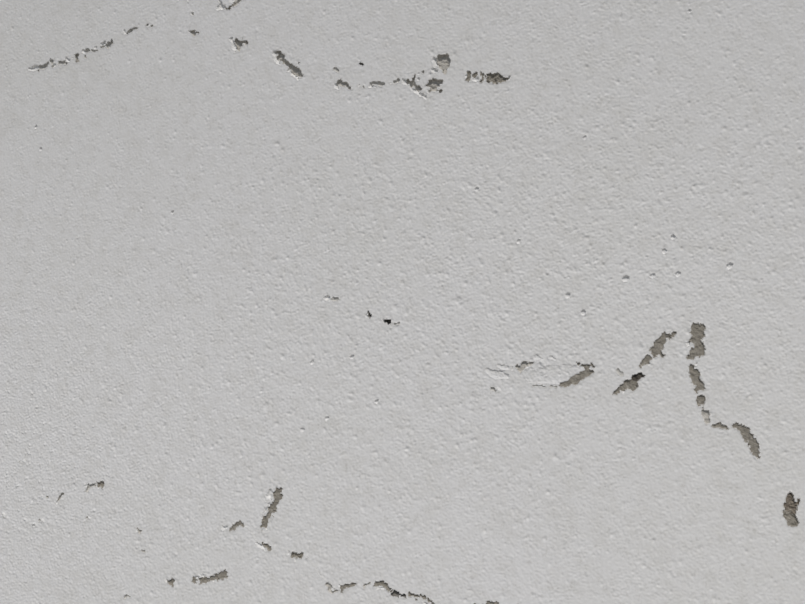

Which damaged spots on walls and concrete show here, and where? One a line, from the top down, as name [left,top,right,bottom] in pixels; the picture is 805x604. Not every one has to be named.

crack [27,23,154,73]
crack [332,52,511,100]
crack [612,322,761,460]
crack [221,519,437,604]